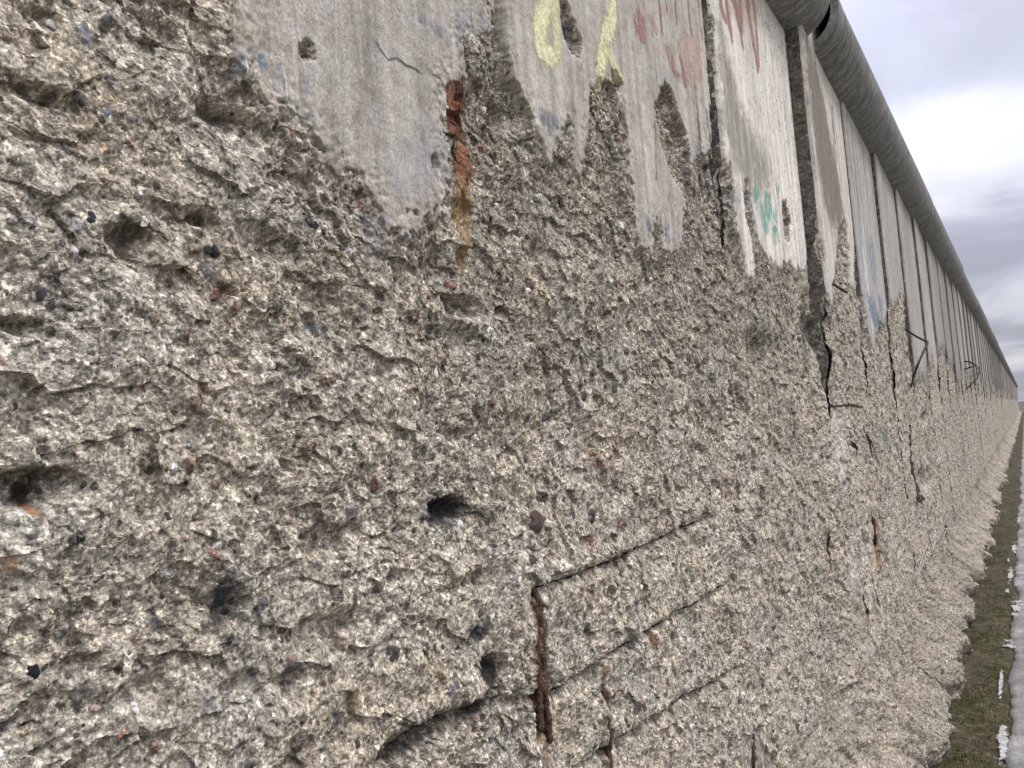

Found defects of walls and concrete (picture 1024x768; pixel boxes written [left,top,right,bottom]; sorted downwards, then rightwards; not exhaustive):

spalling [559,2,581,58]
spalling [704,17,715,59]
rust [445,80,474,270]
spalling [0,0,553,768]
spalling [485,82,1003,768]
crack [909,424,949,528]
crack [535,500,711,588]
rust [528,597,548,701]
crack [550,584,724,690]
crack [571,666,739,768]